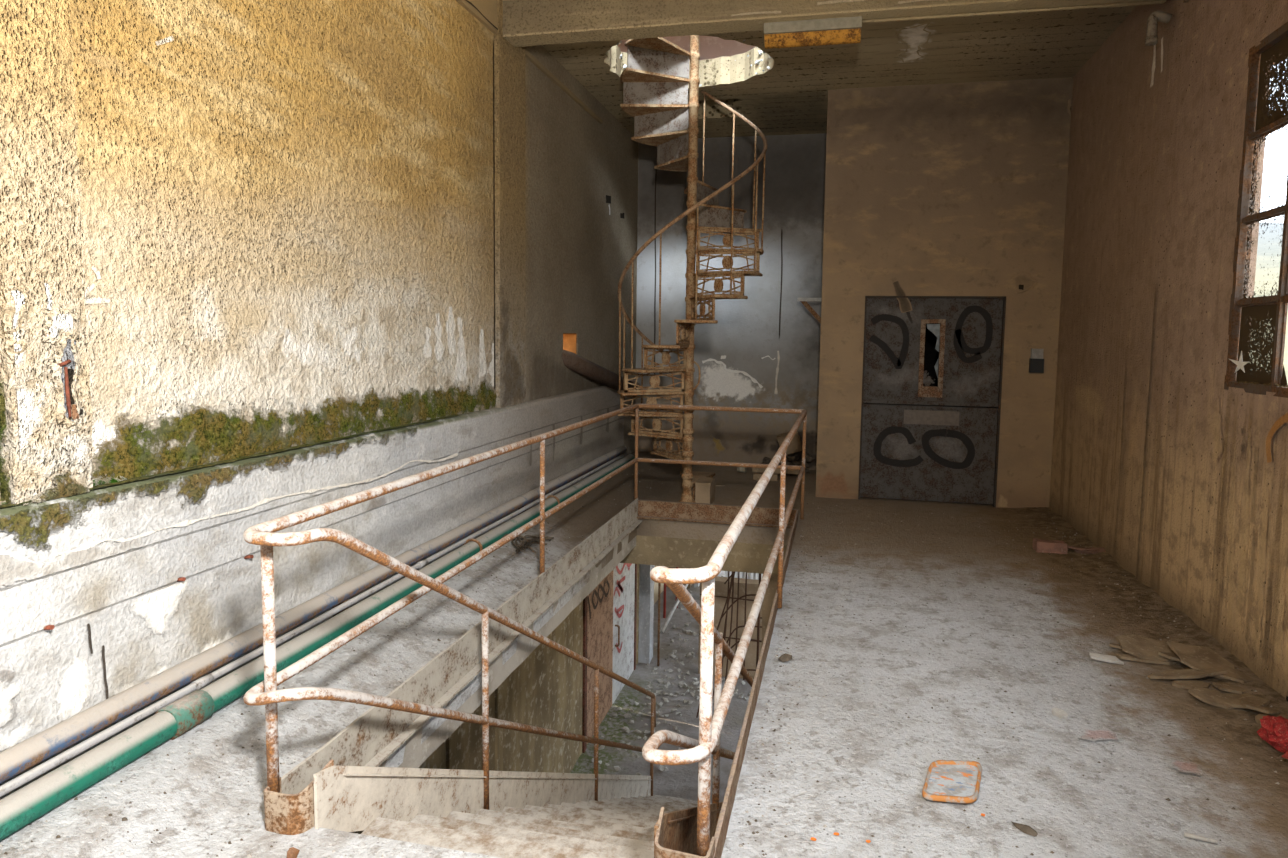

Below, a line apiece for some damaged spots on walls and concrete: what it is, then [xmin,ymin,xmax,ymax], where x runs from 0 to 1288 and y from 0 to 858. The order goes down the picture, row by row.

peeling [3,284,31,359]
spalling [42,283,84,429]
leakage [0,452,459,588]
leakage [92,23,630,464]
leakage [1136,285,1157,580]
leakage [1226,428,1288,677]